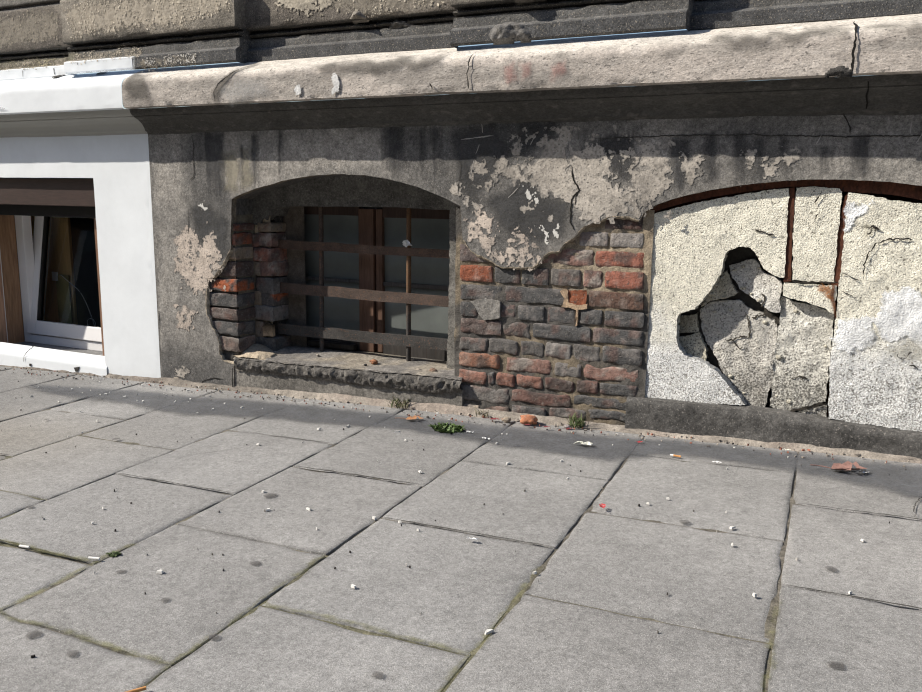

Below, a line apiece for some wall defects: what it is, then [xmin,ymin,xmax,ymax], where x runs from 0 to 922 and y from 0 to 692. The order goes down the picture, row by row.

peeling [272,0,444,21]
crack [602,21,921,139]
damp [600,137,633,176]
damp [671,139,688,188]
damp [855,137,868,171]
crack [569,165,580,229]
spalling [171,125,705,425]
crack [788,238,912,298]
crack [725,294,780,349]
spalling [679,247,838,417]